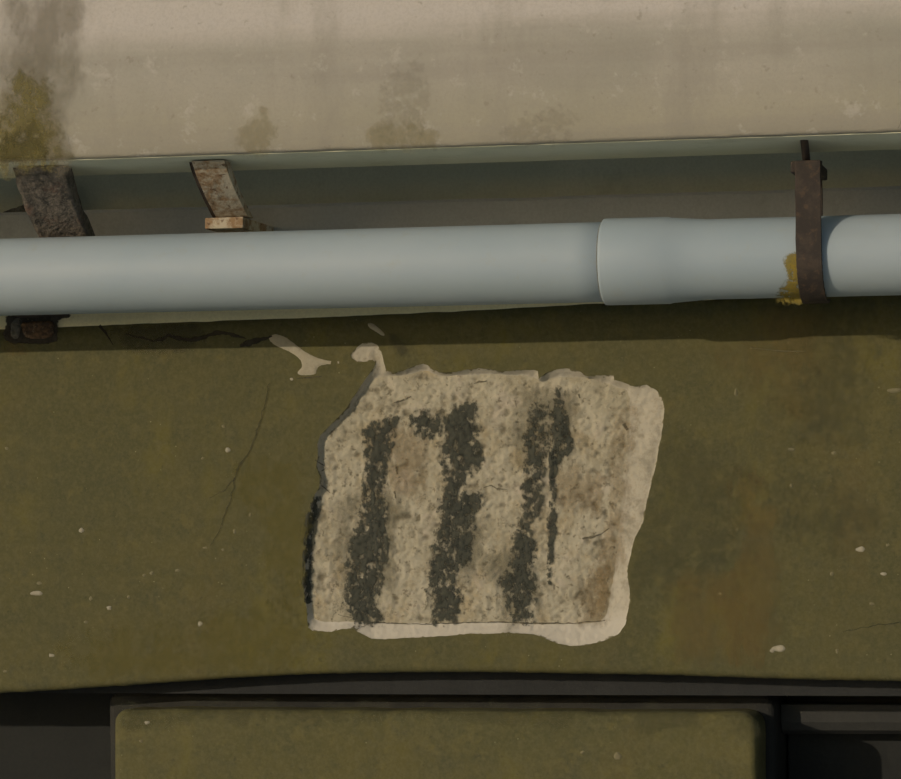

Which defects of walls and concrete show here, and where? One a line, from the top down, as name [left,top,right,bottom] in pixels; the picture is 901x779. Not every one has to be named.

peeling [269,334,339,381]
spalling [302,323,665,646]